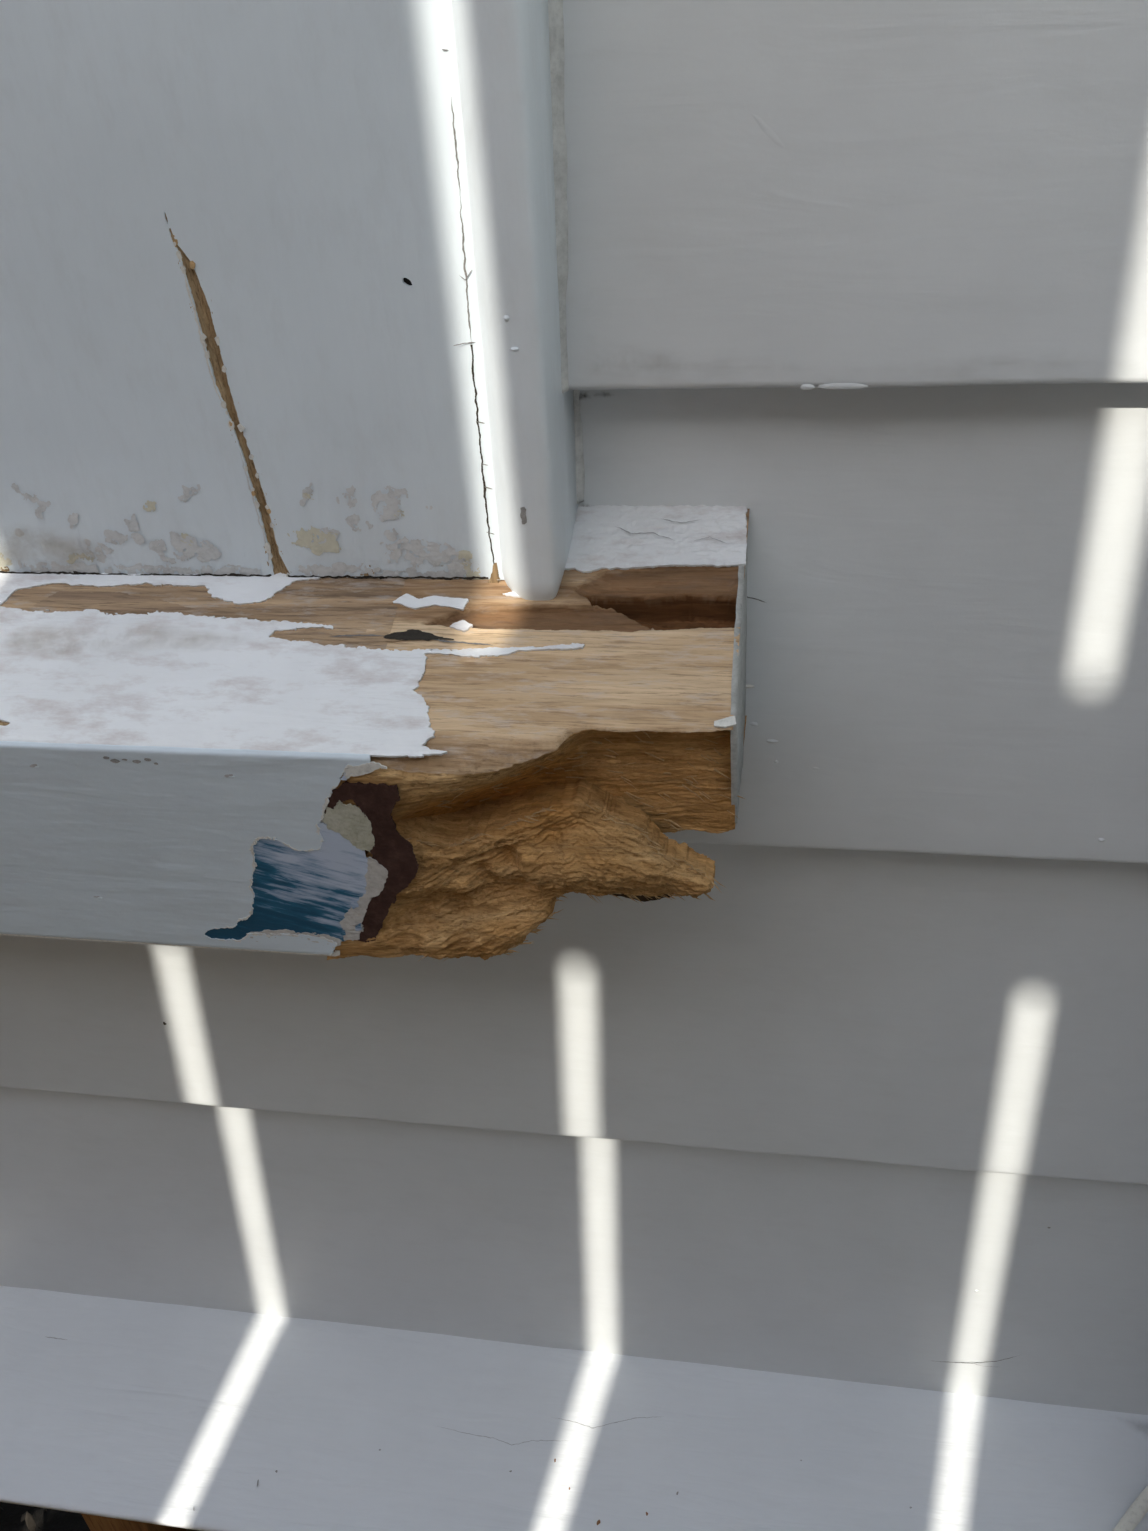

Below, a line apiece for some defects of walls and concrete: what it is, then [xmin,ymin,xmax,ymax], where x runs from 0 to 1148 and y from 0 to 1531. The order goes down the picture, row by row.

crack [165,213,290,577]
crack [451,97,500,583]
peeling [0,500,261,575]
peeling [287,483,489,580]
peeling [205,761,419,956]